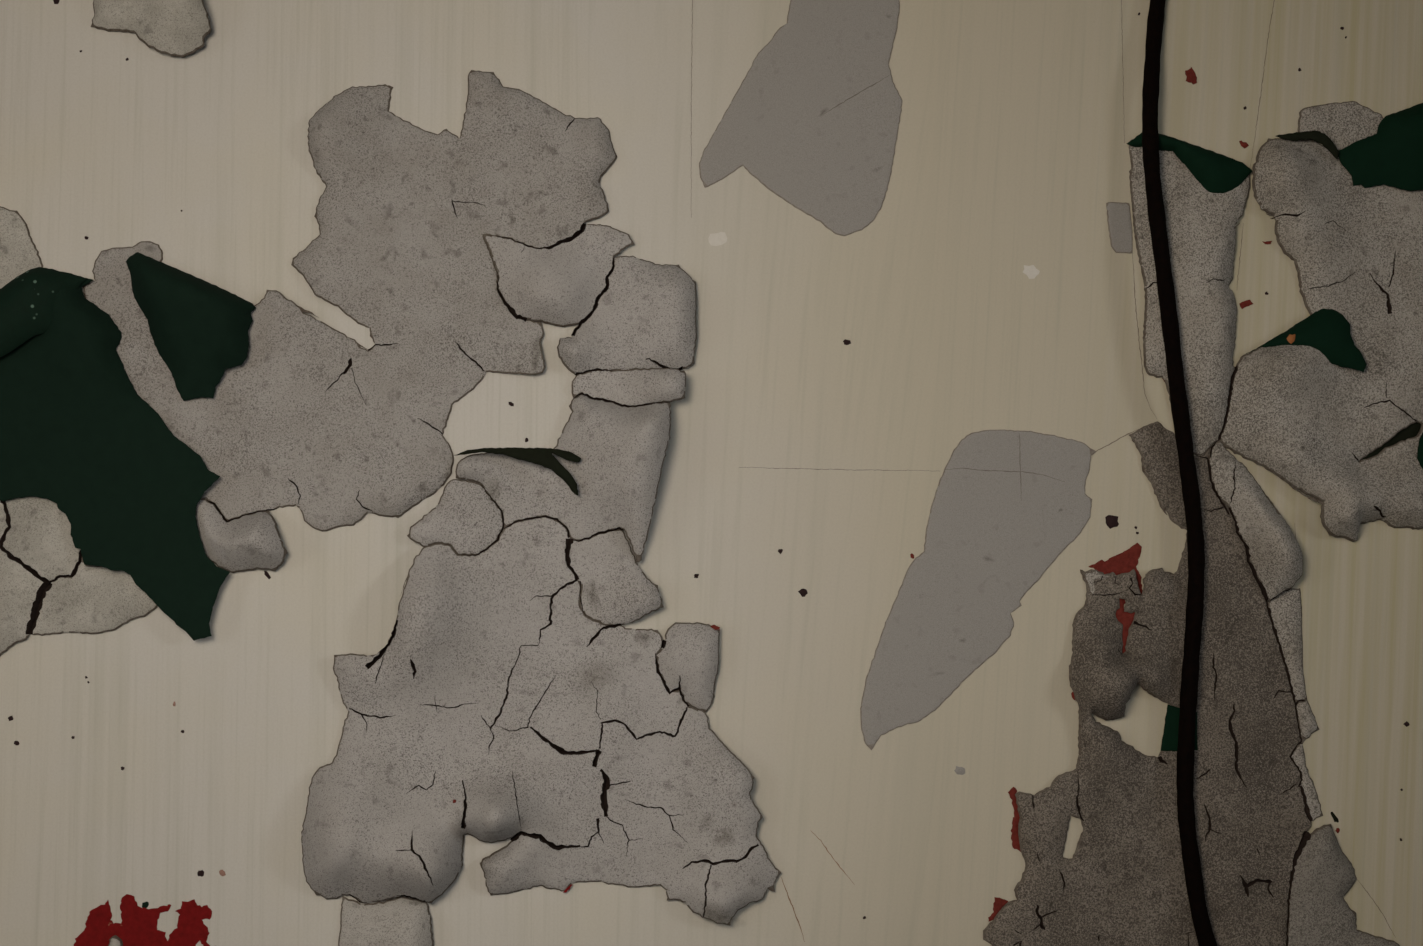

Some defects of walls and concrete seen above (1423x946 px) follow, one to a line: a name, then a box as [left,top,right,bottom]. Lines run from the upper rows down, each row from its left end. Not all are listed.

peeling [91,0,212,57]
peeling [0,206,43,289]
crack [452,200,586,322]
crack [571,257,615,336]
crack [574,358,683,407]
crack [0,500,82,635]
peeling [0,497,158,656]
peeling [83,70,781,946]
crack [349,486,759,917]
crack [1157,654,1247,842]
peeling [983,138,1423,946]
crack [1196,366,1313,946]